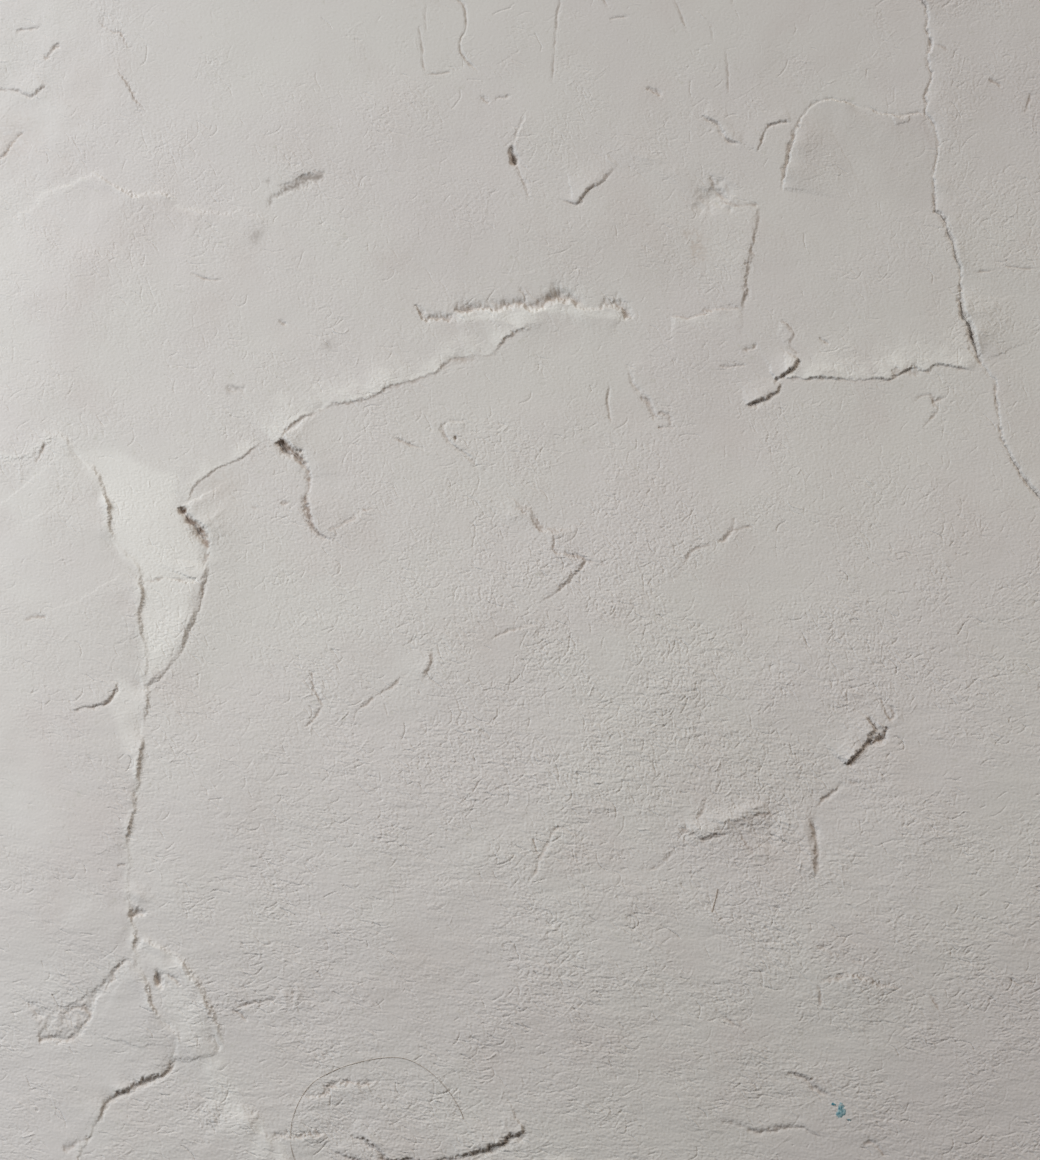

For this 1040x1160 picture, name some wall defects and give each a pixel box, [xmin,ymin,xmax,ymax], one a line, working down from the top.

crack [919,0,1040,502]
crack [605,385,614,424]
crack [720,320,831,409]
crack [251,431,377,546]
crack [348,1115,528,1160]